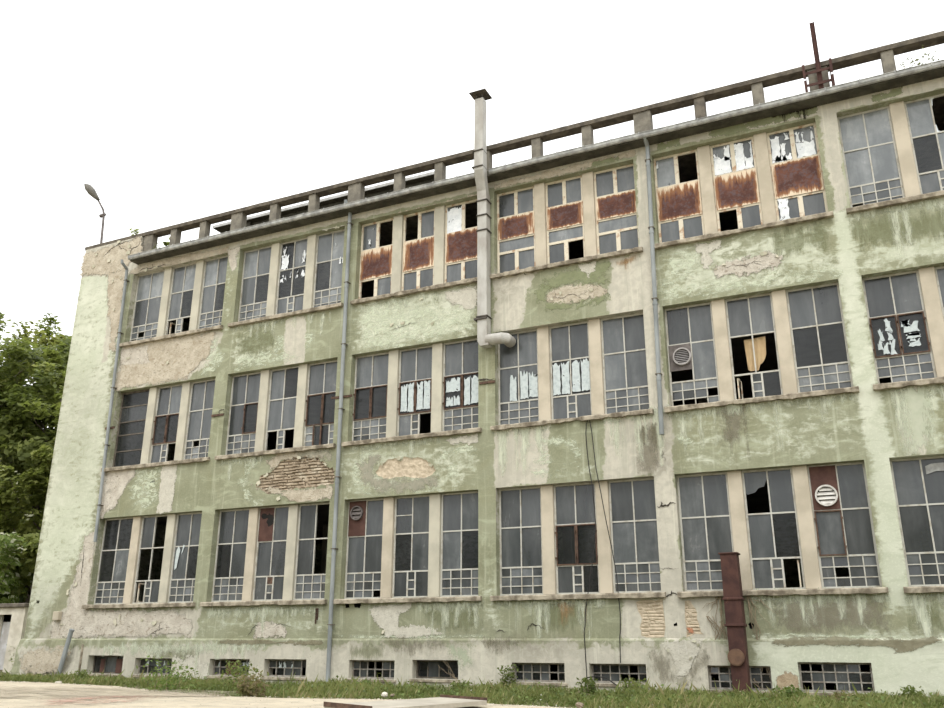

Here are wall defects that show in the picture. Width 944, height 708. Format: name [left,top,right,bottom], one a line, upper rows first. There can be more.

damp [852,197,944,247]
peeling [546,261,608,304]
peeling [694,240,783,278]
peeling [80,237,240,391]
damp [603,393,855,471]
spalling [251,449,335,502]
spalling [357,455,437,494]
peeling [50,532,193,639]
spalling [636,599,703,686]